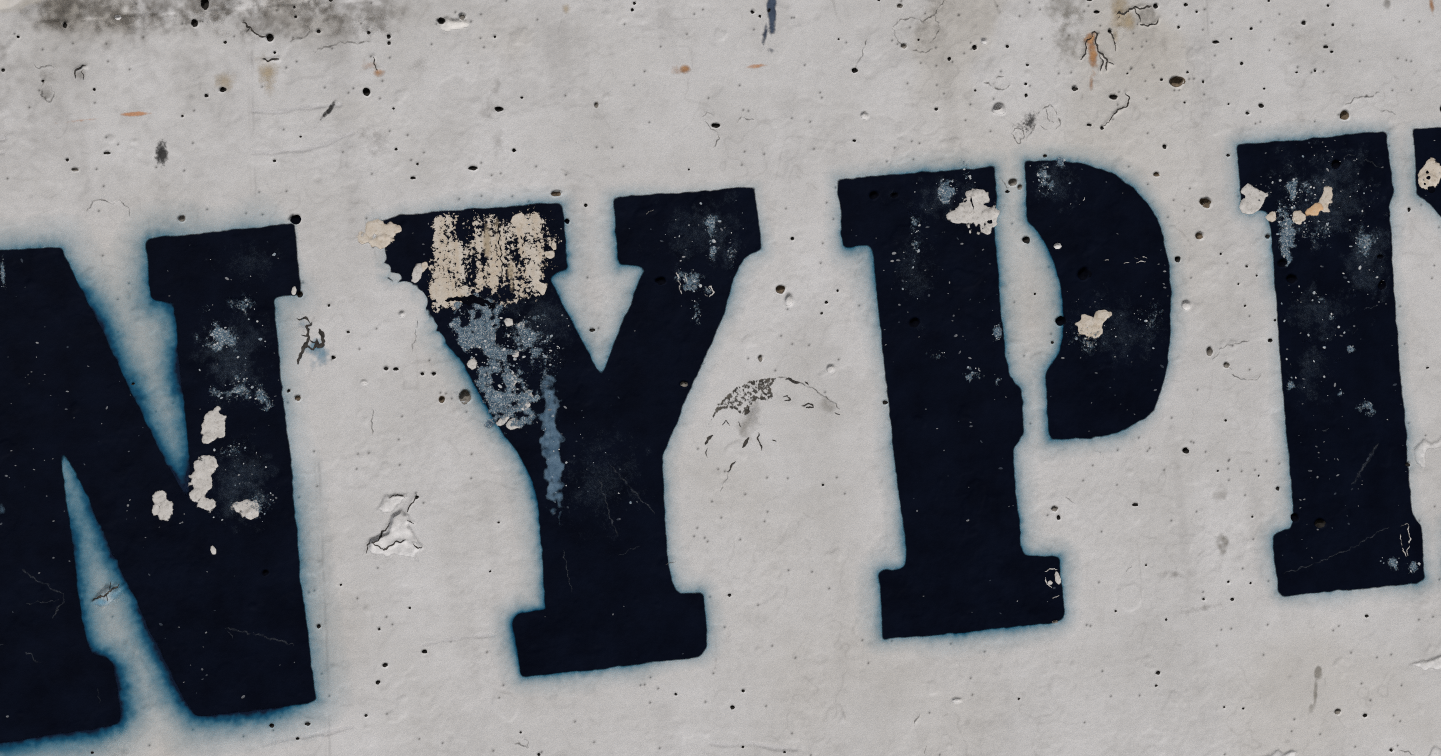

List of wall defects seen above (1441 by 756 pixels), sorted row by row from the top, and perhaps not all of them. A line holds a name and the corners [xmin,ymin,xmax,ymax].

peeling [1418,158,1441,193]
peeling [1239,184,1333,239]
peeling [411,209,570,339]
peeling [1051,310,1112,345]
peeling [496,351,533,430]
peeling [188,406,227,512]
peeling [152,491,173,521]
peeling [233,499,260,520]
spalling [369,494,421,561]